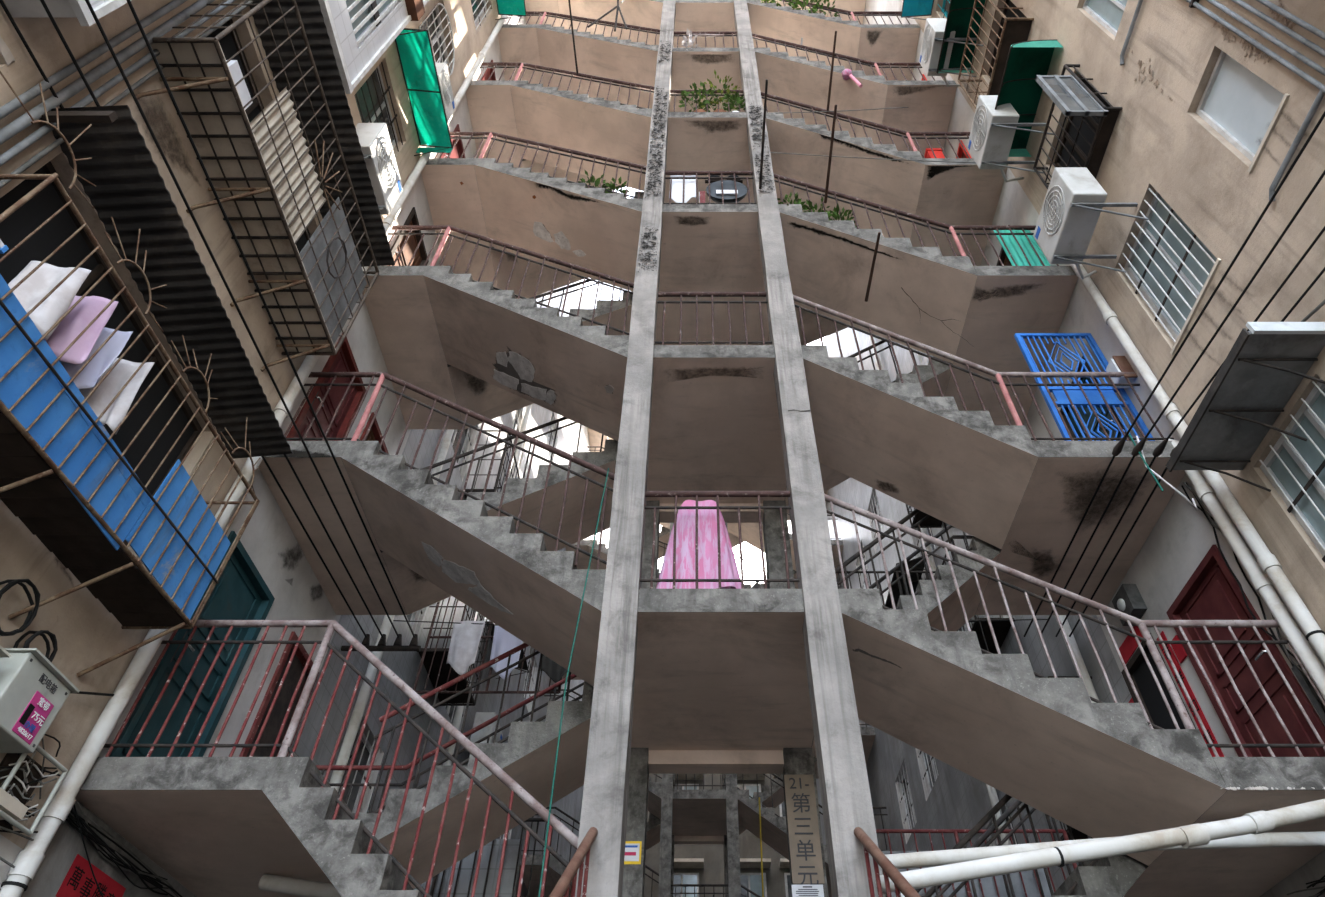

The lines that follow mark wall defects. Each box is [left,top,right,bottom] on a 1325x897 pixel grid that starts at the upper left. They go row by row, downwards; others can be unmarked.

water stain [644,85,668,199]
water stain [638,226,658,272]
flaking render [493,348,556,405]
water stain [1015,545,1055,576]